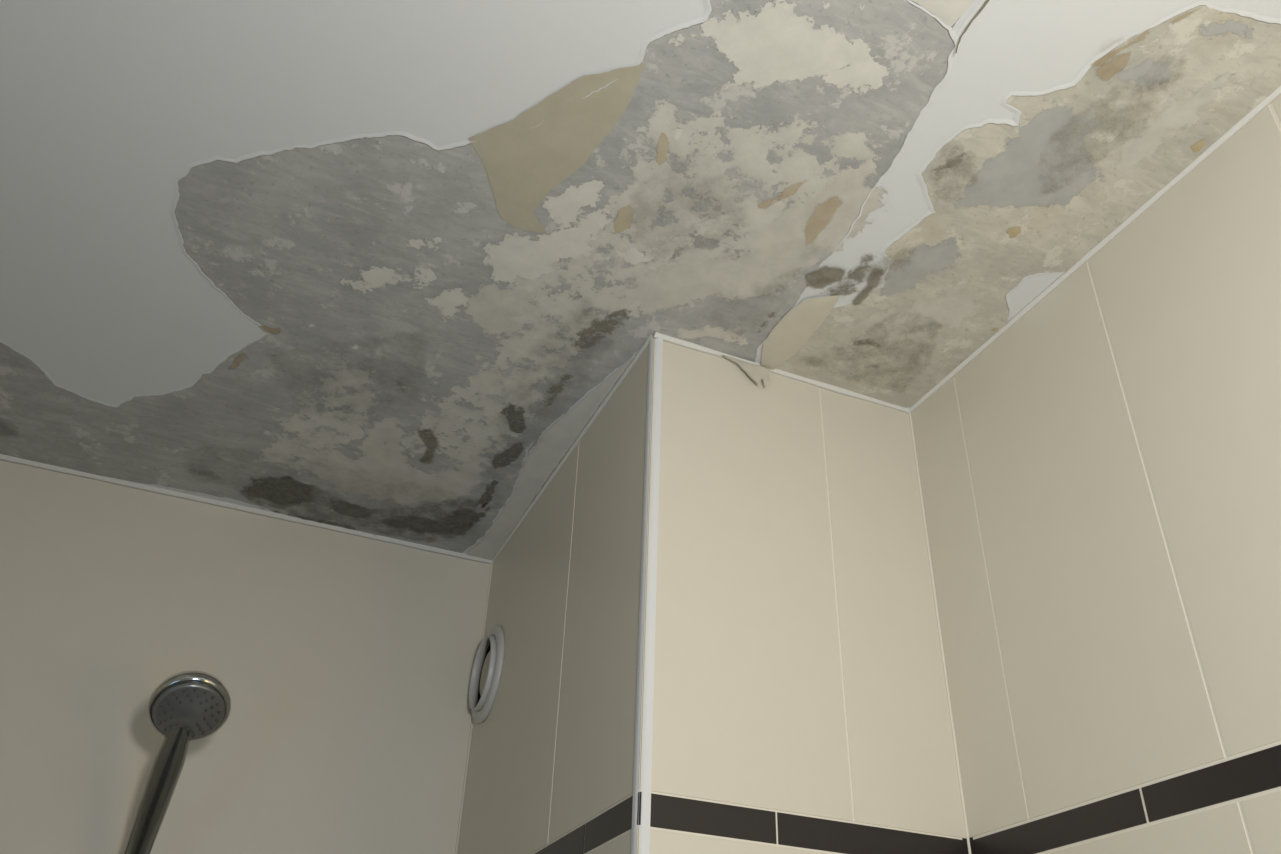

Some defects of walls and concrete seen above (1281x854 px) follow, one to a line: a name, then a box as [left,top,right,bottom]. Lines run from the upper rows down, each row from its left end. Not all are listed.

crack [955,0,989,53]
peeling [0,0,1281,553]
damp [830,255,873,296]
damp [575,309,630,348]
damp [244,405,525,541]